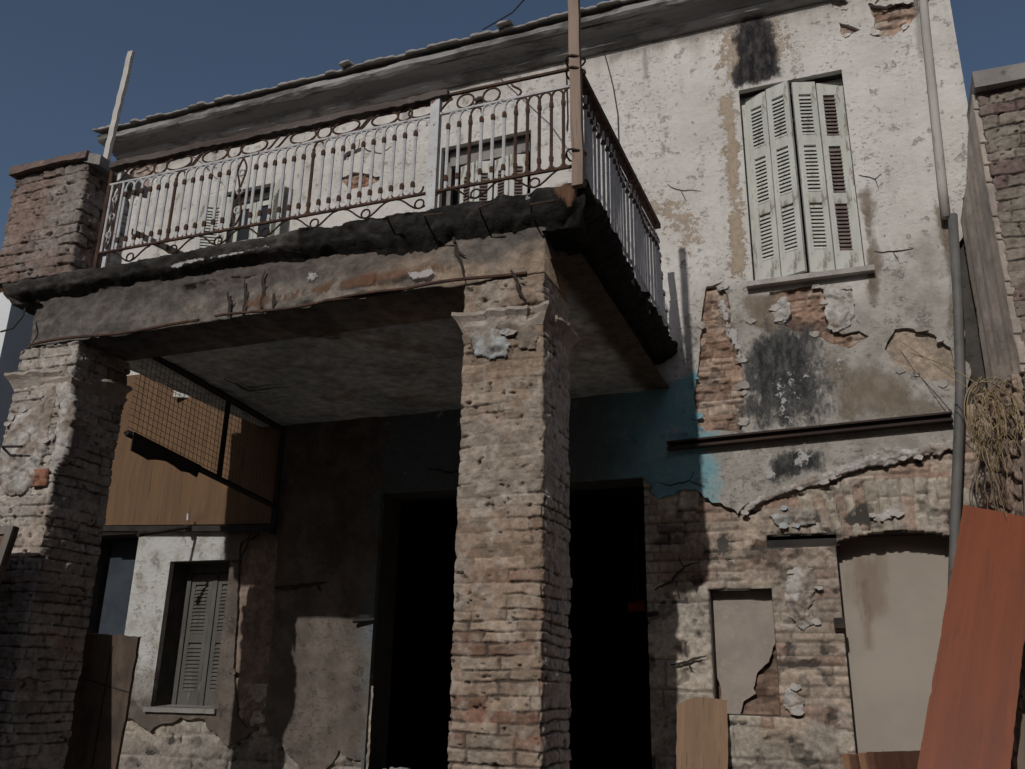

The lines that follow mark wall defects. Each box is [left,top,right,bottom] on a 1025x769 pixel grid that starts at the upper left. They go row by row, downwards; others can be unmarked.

flaking render [840,23,857,38]
flaking render [870,0,919,37]
flaking render [770,284,867,348]
leakage [718,294,938,429]
leakage [789,441,813,475]
crack [654,556,700,594]
flaking render [643,404,989,769]
flaking render [118,532,299,769]
flaking render [328,686,373,769]